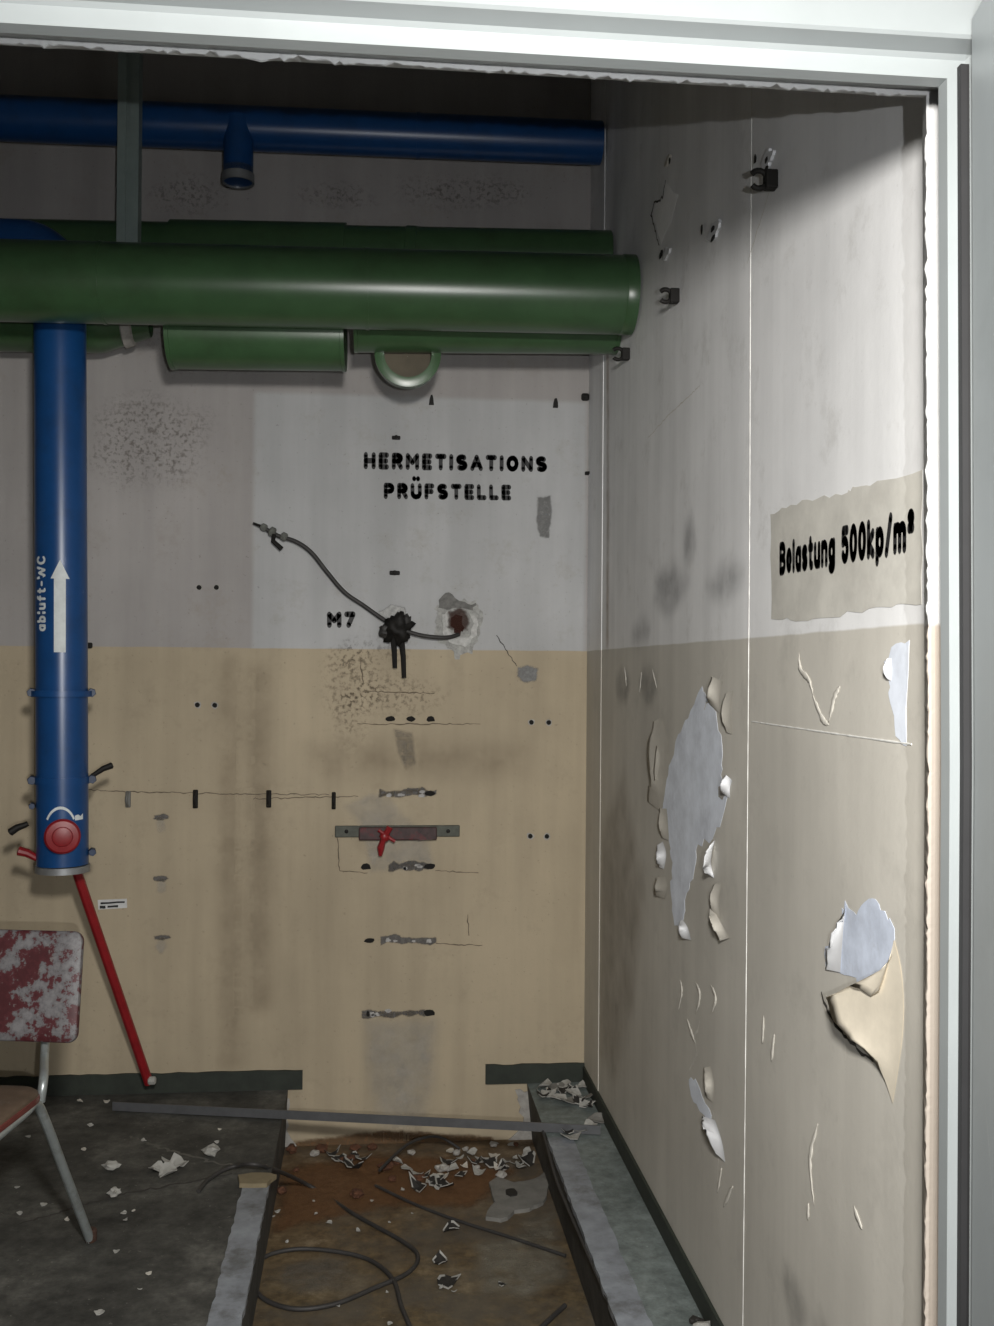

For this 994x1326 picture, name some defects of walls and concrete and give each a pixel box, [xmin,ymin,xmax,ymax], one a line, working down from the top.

flaking render [434,592,483,660]
peeling [883,641,909,746]
peeling [647,657,733,941]
peeling [821,898,904,1102]
peeling [689,1020,725,1181]